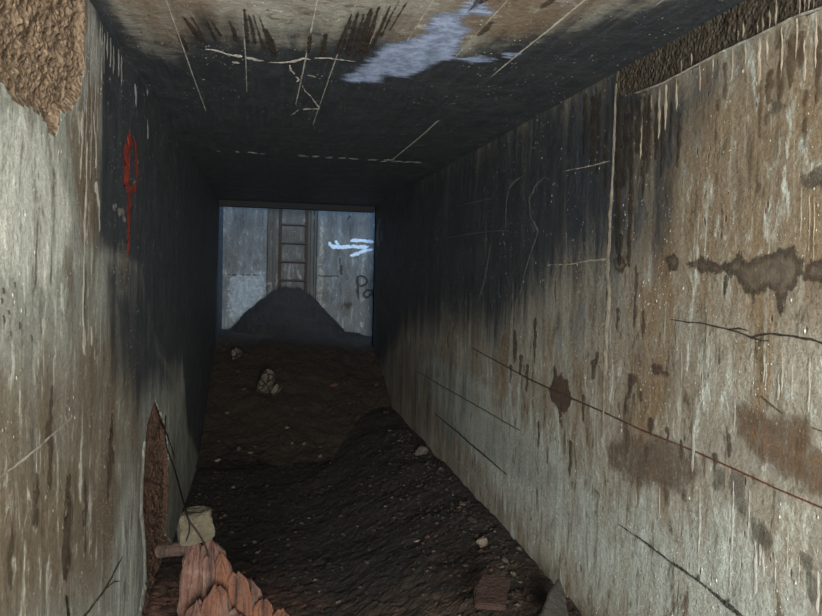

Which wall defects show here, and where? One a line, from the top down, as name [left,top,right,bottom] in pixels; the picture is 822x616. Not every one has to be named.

spalling [0,0,87,145]
spalling [613,0,822,102]
damp [757,0,822,147]
damp [548,53,701,435]
damp [667,165,822,315]
crack [670,319,822,344]
spalling [137,397,173,616]
damp [609,418,695,519]
crack [619,524,742,616]
damp [712,453,776,594]
damp [727,358,822,495]
damp [798,553,820,614]